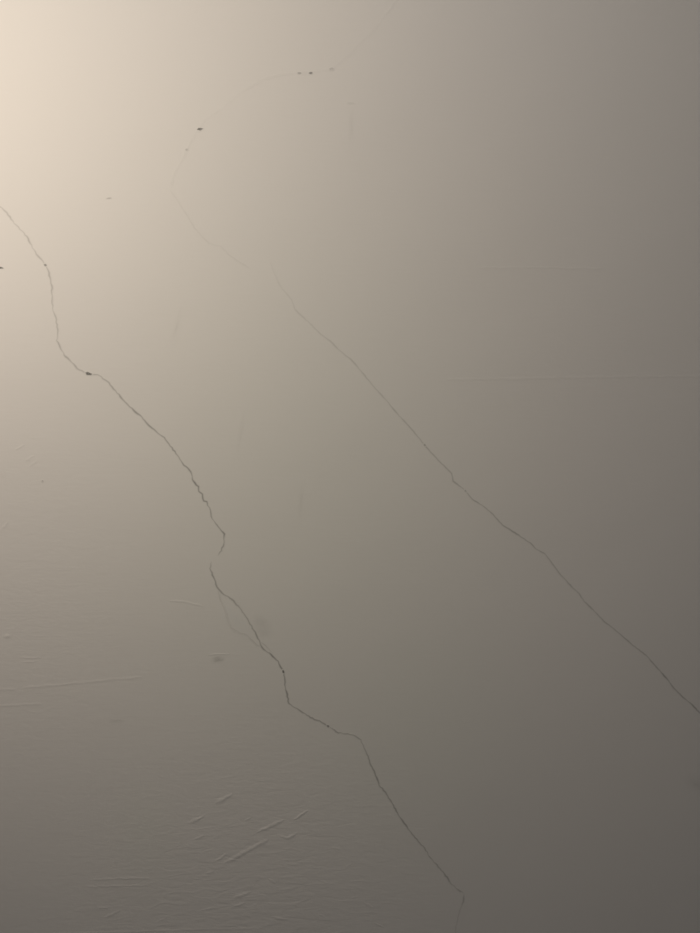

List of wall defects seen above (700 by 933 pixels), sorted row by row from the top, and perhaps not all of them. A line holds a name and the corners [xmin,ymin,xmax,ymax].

crack [0,205,465,933]
crack [169,189,700,714]